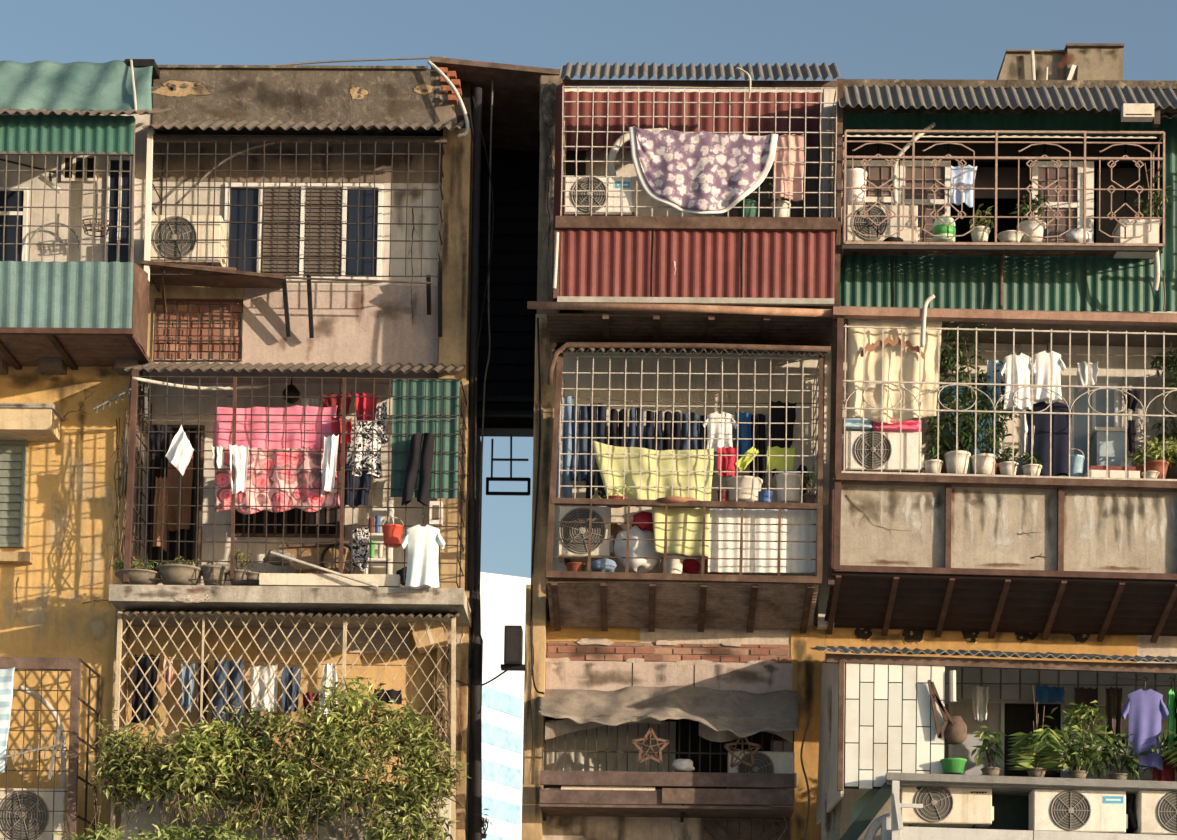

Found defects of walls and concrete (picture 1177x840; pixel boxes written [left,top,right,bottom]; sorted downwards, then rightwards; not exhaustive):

spalling [151,78,214,98]
spalling [348,85,371,101]
flaking render [412,67,462,106]
crack [845,495,908,539]
damp [851,492,940,530]
damp [964,491,1011,546]
damp [1074,494,1175,546]
damp [577,647,636,684]
damp [709,650,773,680]